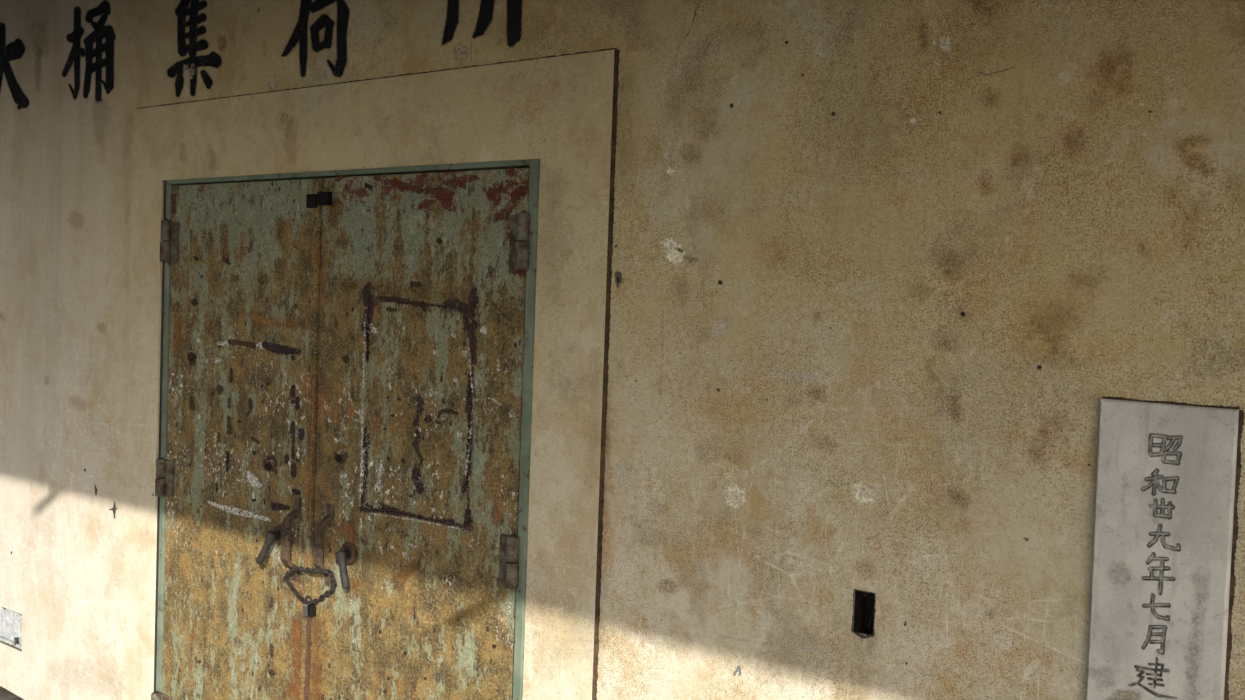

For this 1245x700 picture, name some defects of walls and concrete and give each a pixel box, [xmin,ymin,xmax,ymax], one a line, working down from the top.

peeling [364,166,529,223]
spalling [660,235,687,267]
corrosion [268,616,349,700]